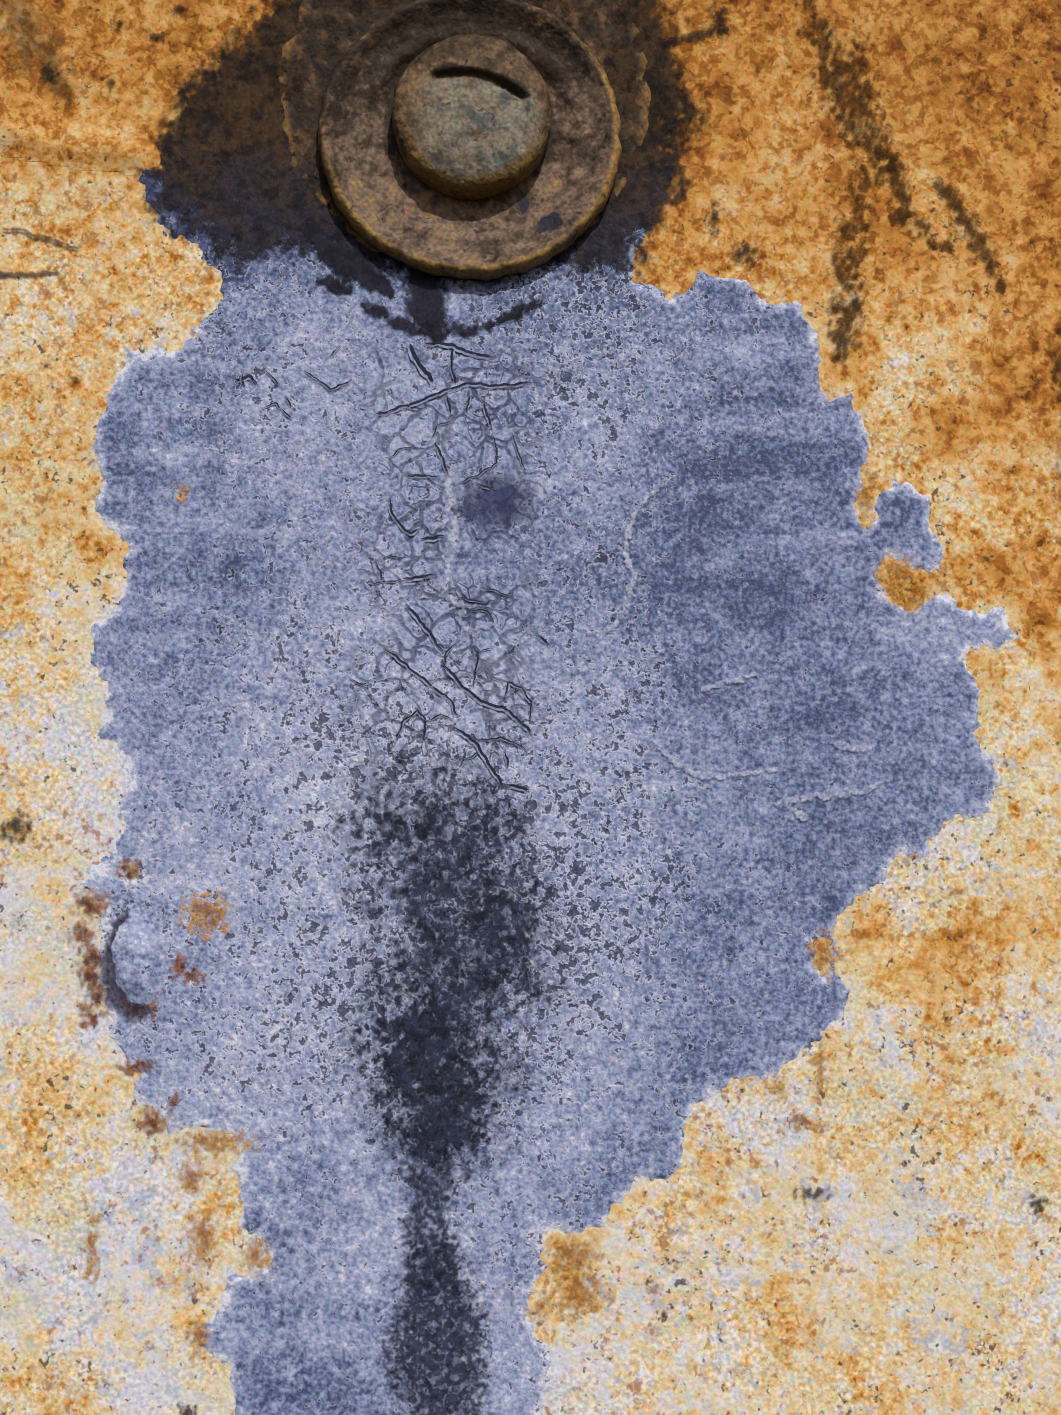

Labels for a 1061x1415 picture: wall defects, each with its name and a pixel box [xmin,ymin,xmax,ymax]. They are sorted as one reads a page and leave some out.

corrosion [797,0,1007,362]
leakage [298,219,543,346]
crack [235,345,353,420]
crack [370,341,534,792]
corrosion [74,890,109,1027]
corrosion [116,859,139,879]
corrosion [174,953,205,984]
corrosion [182,892,228,941]
corrosion [116,1059,152,1075]
leakage [335,752,563,1415]
corrosion [137,1092,251,1191]
corrosion [83,1213,103,1278]